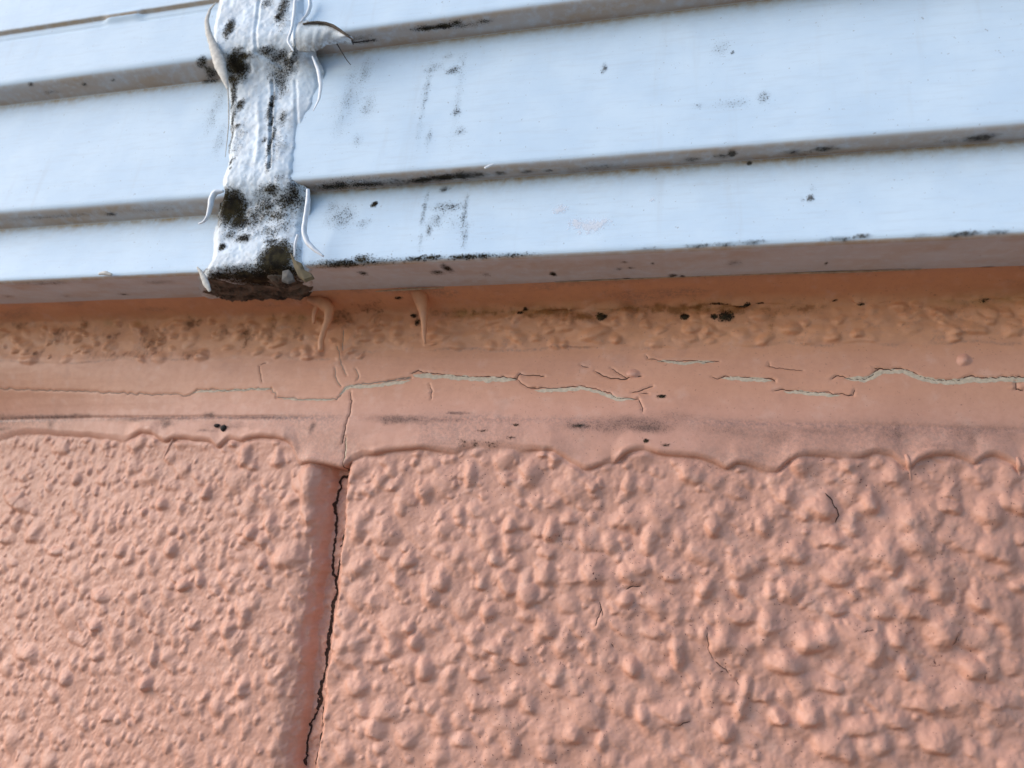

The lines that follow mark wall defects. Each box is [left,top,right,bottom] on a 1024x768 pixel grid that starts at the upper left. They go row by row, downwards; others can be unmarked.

leakage [263,0,291,31]
peeling [205,2,229,157]
peeling [312,56,322,111]
leakage [196,19,532,302]
peeling [198,189,224,224]
peeling [294,189,324,257]
leakage [710,302,763,322]
crack [0,330,1024,766]